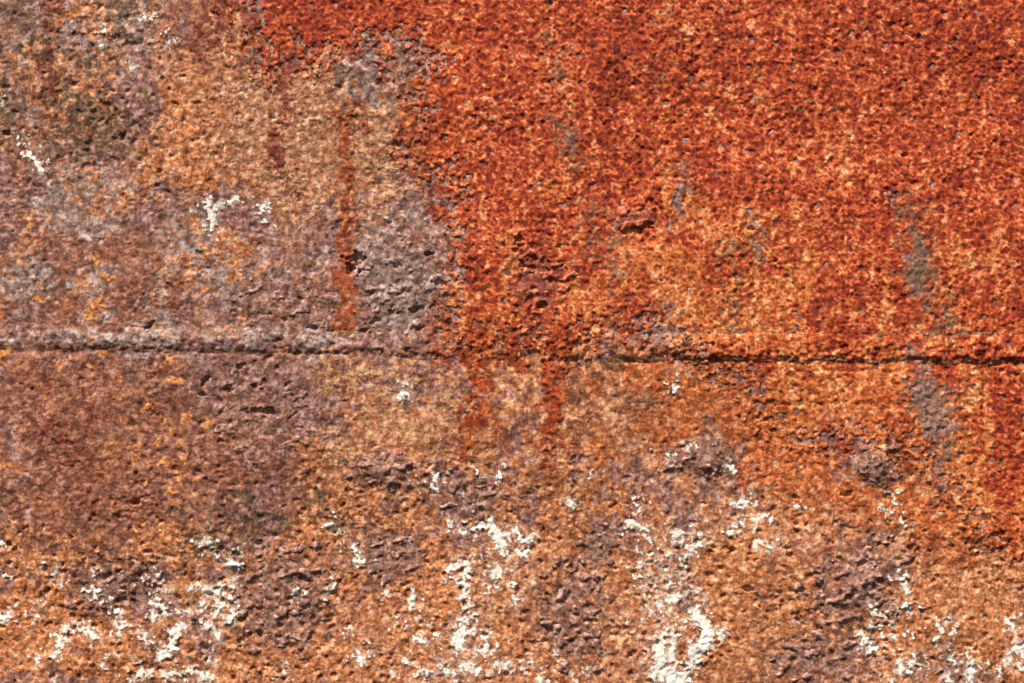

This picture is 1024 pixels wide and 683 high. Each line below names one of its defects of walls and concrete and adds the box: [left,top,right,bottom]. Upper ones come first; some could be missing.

crack [0,322,442,361]
crack [606,327,1024,366]
rust [528,632,597,683]